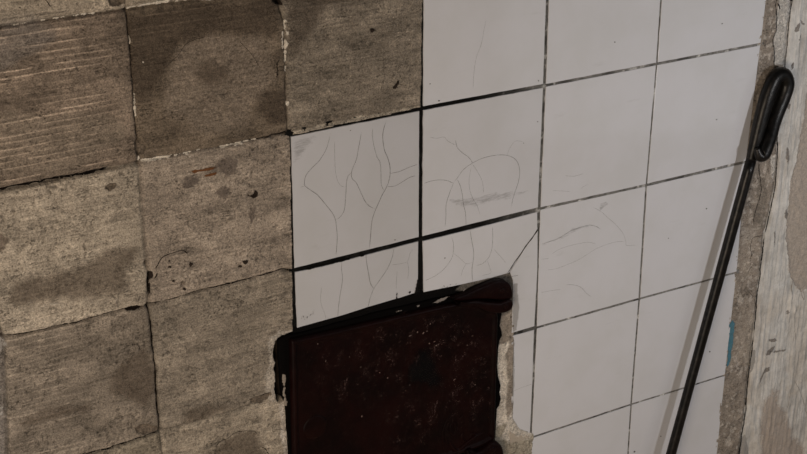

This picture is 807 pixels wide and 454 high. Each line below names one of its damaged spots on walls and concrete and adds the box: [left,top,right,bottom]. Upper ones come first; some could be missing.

crack [772,0,793,67]
crack [304,126,520,280]
crack [739,137,778,454]
peeling [785,94,807,292]